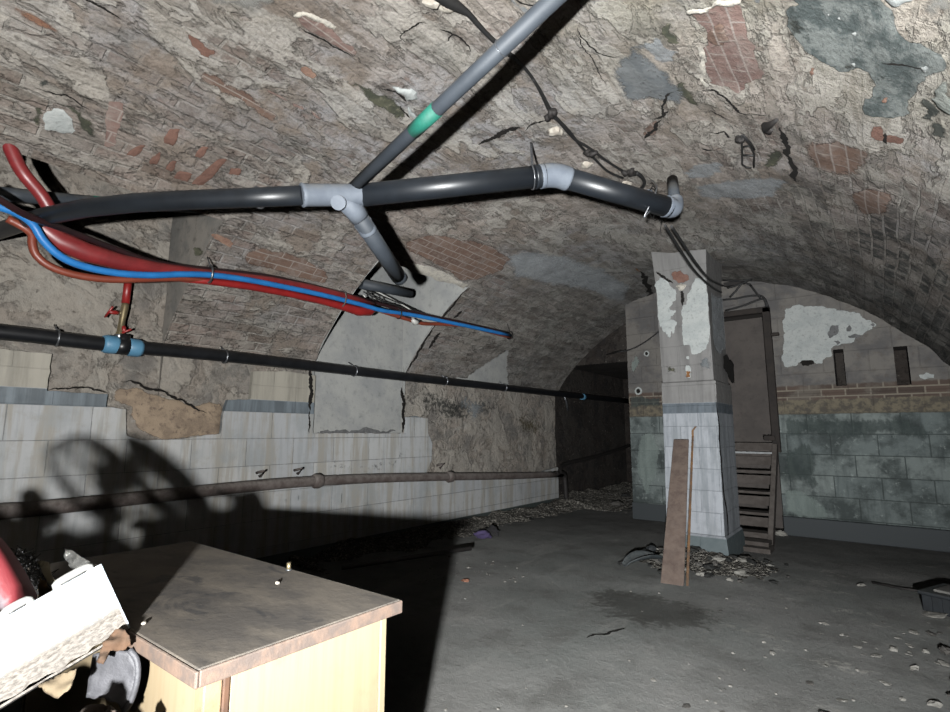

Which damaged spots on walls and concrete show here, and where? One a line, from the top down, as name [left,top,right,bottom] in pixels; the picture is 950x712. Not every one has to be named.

flaking render [686,0,765,93]
flaking render [786,0,950,144]
peeling [43,108,75,133]
crack [644,92,674,139]
flaking render [806,141,869,176]
crack [308,290,466,433]
peeling [655,270,734,384]
peeling [781,305,876,367]
crack [50,380,206,413]
flaking render [114,388,222,440]
water stain [787,419,926,485]